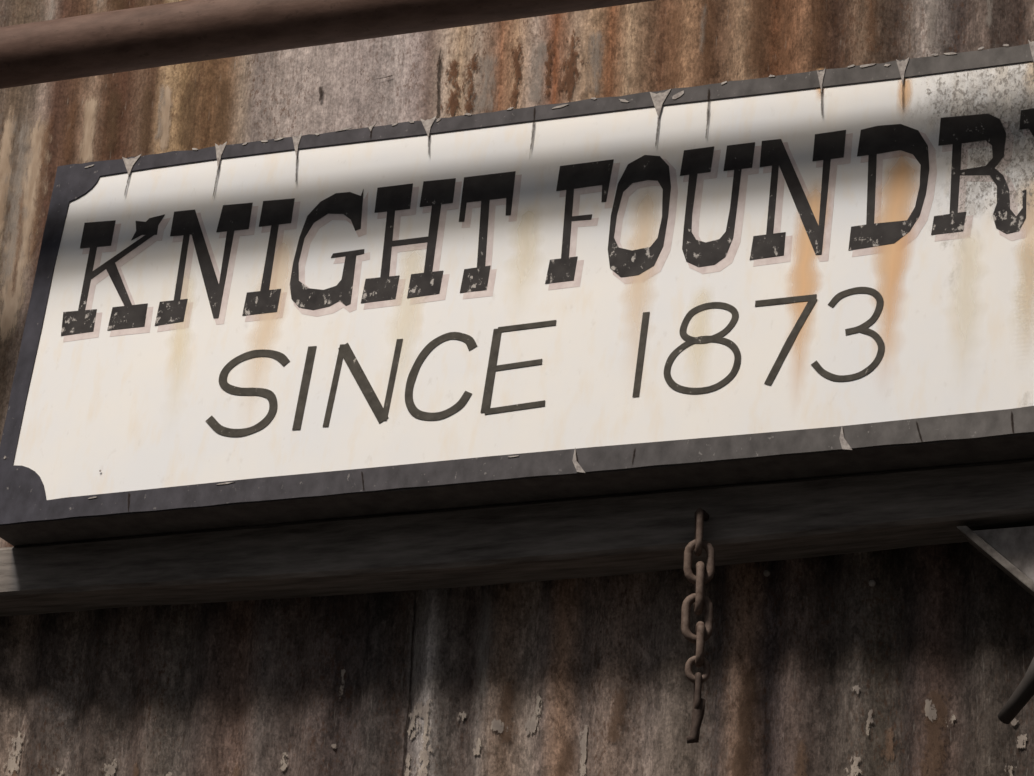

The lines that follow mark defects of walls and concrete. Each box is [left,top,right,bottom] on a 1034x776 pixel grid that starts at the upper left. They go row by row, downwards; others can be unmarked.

rust [441,53,481,116]
rust [510,44,523,107]
rust [543,30,584,102]
peeling [3,731,28,775]
peeling [99,757,117,776]
peeling [405,697,433,776]
peeling [521,692,542,735]
peeling [578,724,590,776]
peeling [845,756,862,776]
peeling [925,699,955,727]
peeling [1011,718,1027,749]